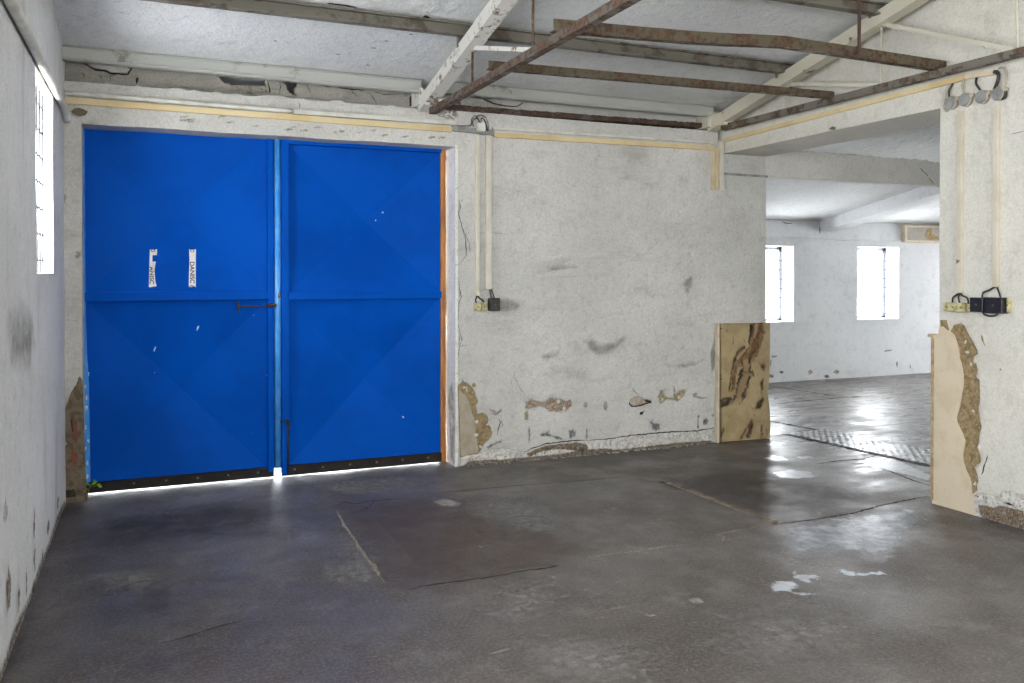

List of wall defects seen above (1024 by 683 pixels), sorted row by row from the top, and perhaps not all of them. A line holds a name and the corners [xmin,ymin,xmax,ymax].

crack [83,63,132,78]
flaking render [458,381,715,467]
peeling [927,320,1024,530]